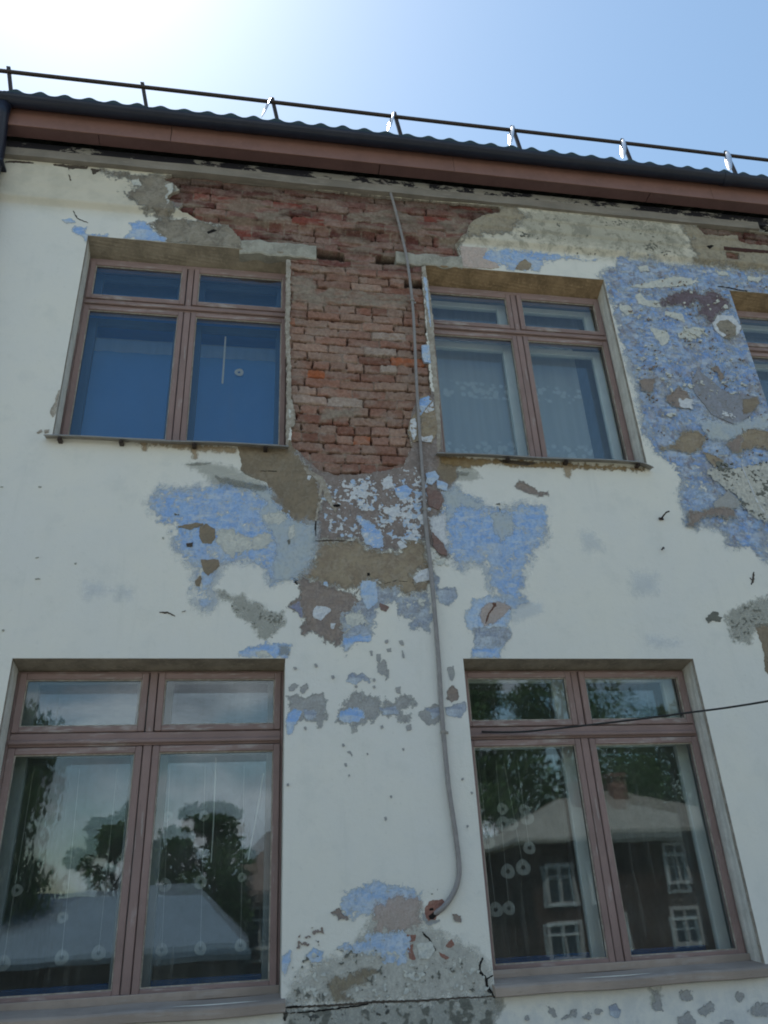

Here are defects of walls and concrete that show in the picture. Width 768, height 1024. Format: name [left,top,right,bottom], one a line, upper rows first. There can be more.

peeling [62,211,109,243]
flaking render [99,168,768,735]
peeling [282,879,493,1005]
crack [283,957,495,1021]
spalling [548,1003,621,1020]
spalling [678,989,715,1024]
spalling [735,991,768,1017]